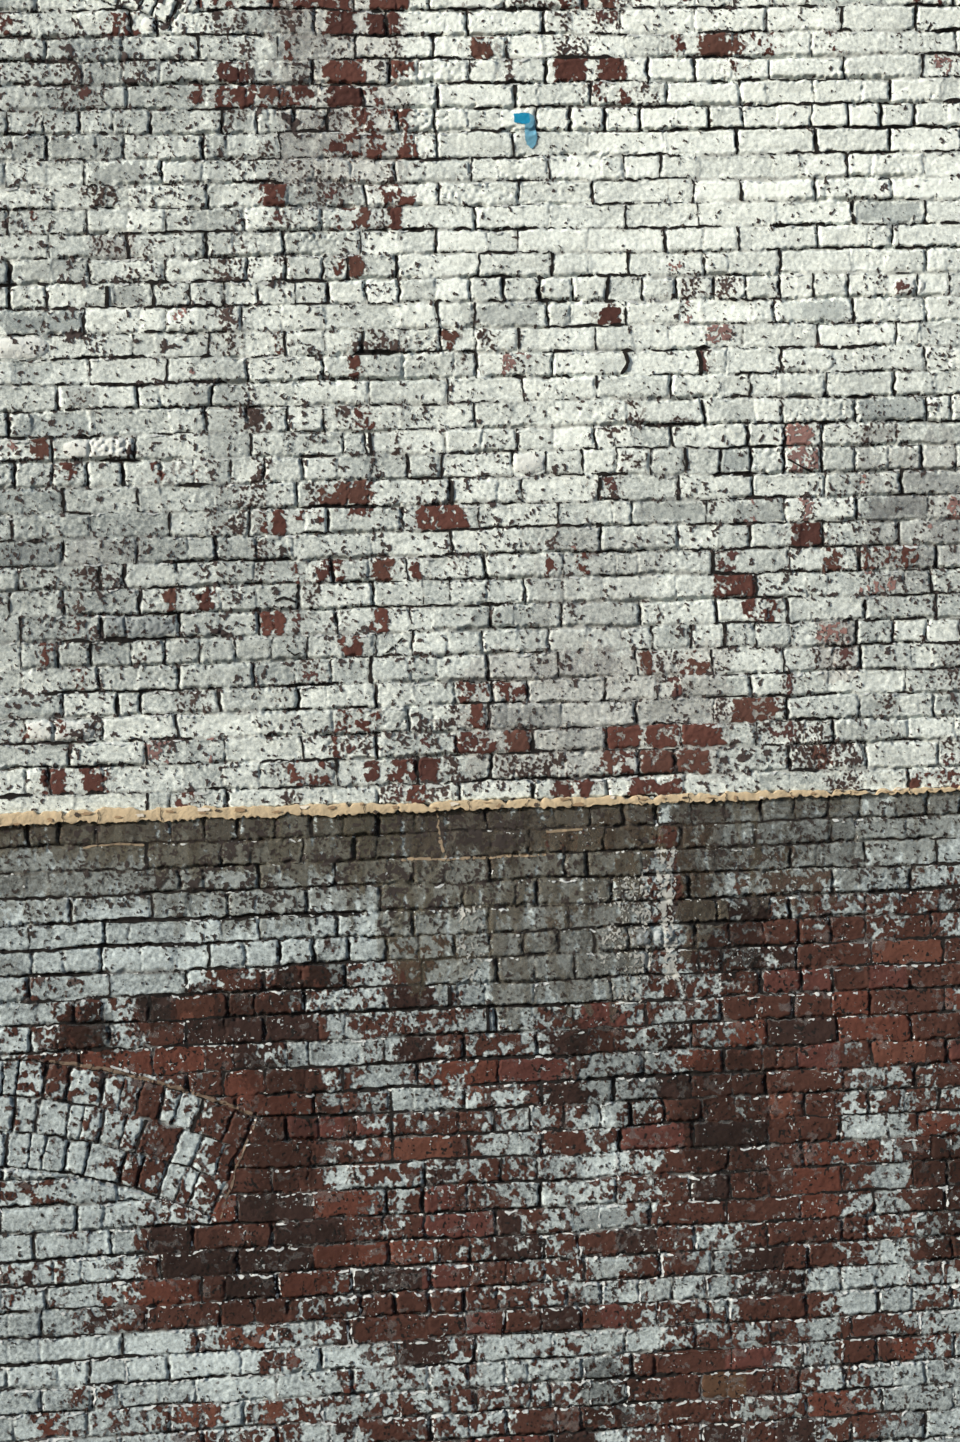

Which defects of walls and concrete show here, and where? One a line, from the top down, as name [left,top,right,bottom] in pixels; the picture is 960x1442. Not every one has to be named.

peeling [790,0,846,58]
water stain [264,107,479,137]
peeling [860,0,960,197]
peeling [420,135,506,231]
peeling [631,139,740,236]
peeling [751,154,960,311]
peeling [762,335,818,389]
water stain [84,542,135,618]
water stain [90,690,219,719]
water stain [739,647,936,698]